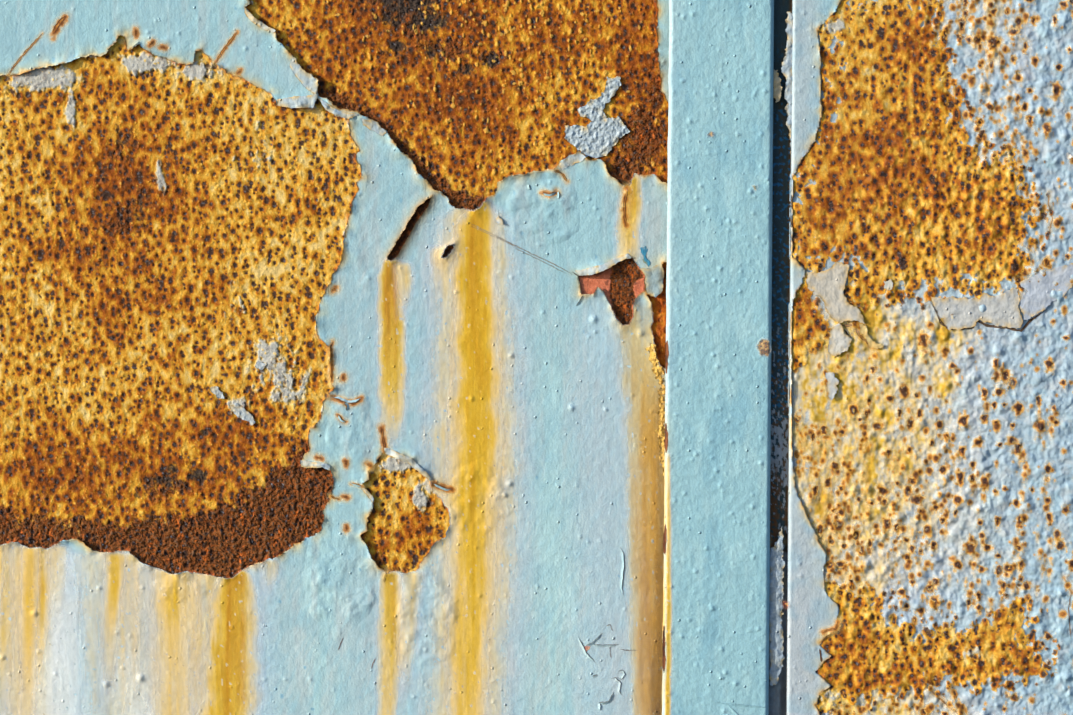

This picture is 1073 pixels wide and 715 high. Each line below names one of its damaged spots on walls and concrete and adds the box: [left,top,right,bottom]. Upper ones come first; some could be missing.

peeling [816,63,841,145]
peeling [818,23,847,71]
peeling [789,164,888,357]
corrosion [0,0,672,715]
peeling [788,302,800,416]
peeling [821,369,852,409]
peeling [872,0,1073,715]